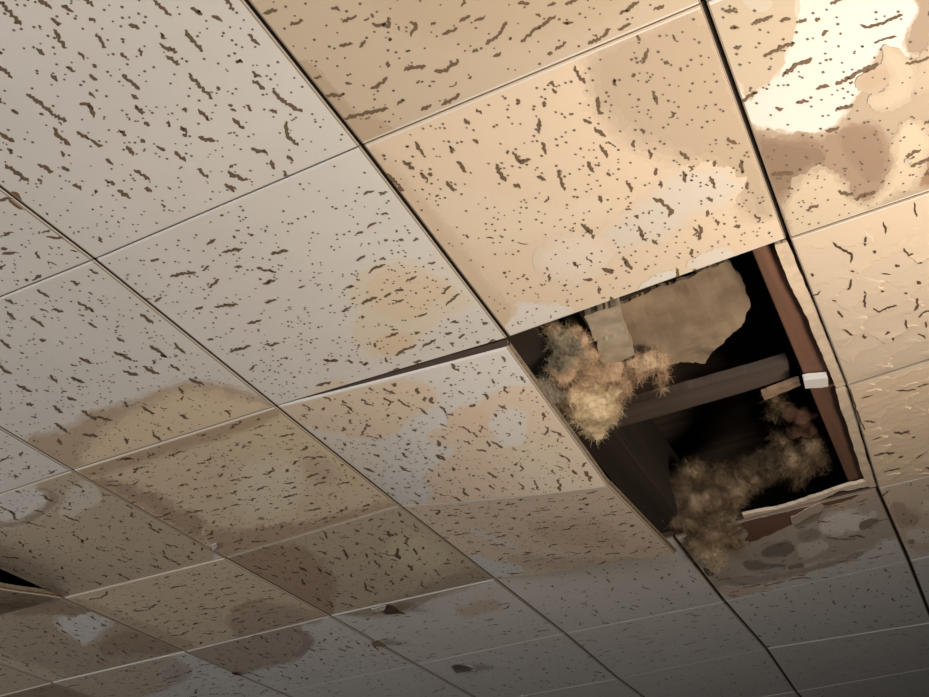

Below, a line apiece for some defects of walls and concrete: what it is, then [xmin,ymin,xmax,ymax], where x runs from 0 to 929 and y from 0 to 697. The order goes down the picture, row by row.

damp [251,0,929,365]
peeling [505,301,575,335]
peeling [639,246,734,289]
crack [811,222,929,341]
crack [850,389,929,472]
damp [0,376,673,697]
spalling [742,494,859,542]
damp [706,477,929,598]